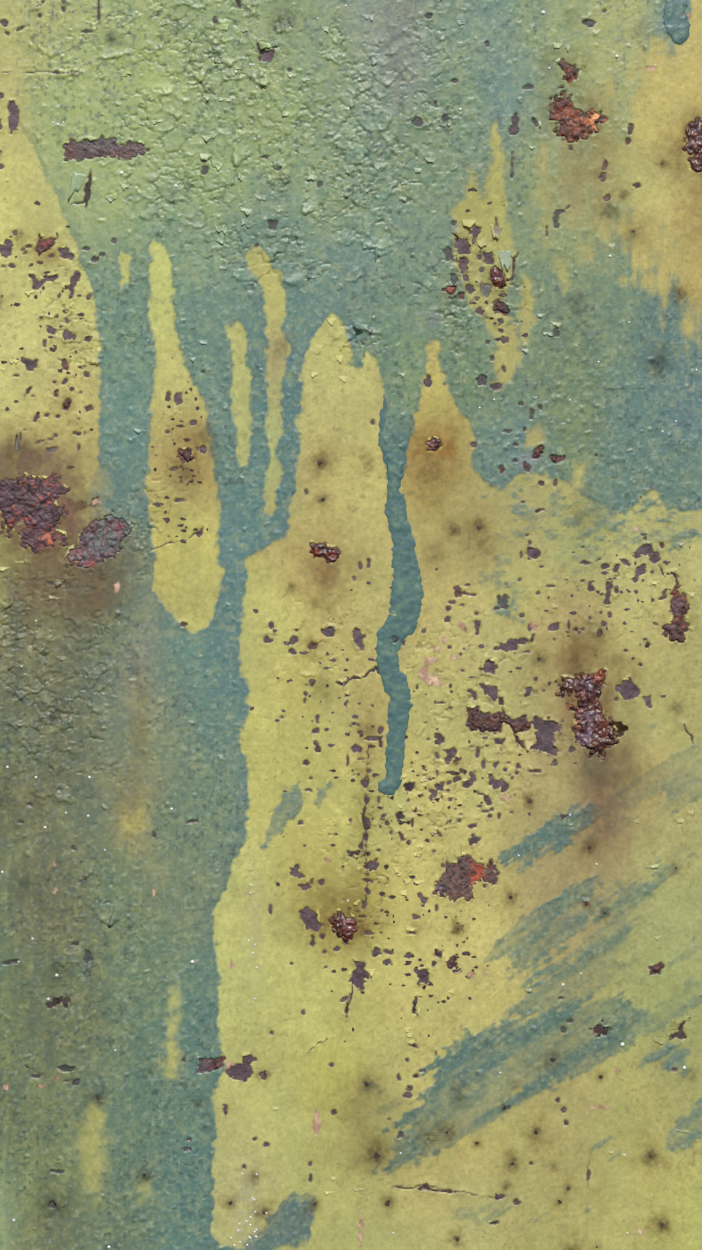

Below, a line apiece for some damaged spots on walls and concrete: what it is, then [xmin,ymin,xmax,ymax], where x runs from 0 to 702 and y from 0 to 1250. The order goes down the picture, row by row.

peeling [0,93,19,135]
corrosion [548,58,607,143]
corrosion [678,117,702,172]
peeling [442,201,562,353]
corrosion [0,450,133,591]
peeling [537,533,690,708]
corrosion [662,581,692,646]
corrosion [555,641,624,763]
peeling [264,584,577,1061]
corrosion [433,852,499,902]
peeling [648,960,665,975]
peeling [183,1052,266,1082]